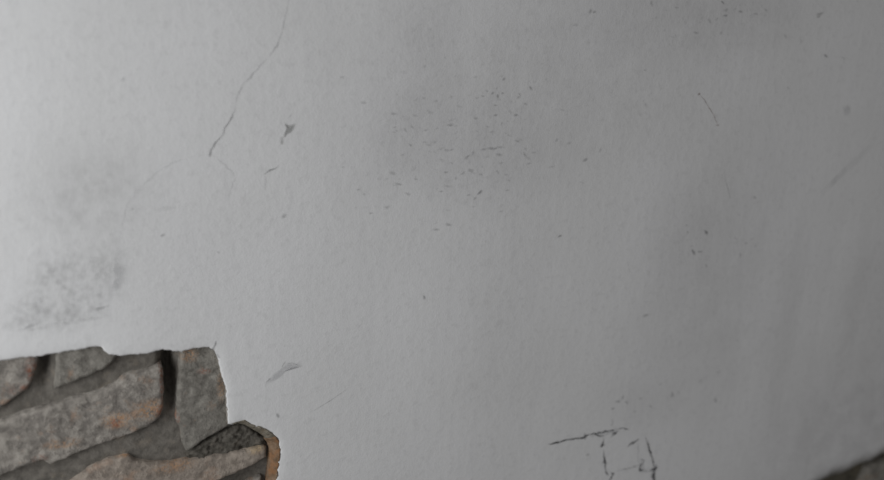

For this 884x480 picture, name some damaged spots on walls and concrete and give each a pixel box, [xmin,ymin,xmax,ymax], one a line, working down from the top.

flaking render [0,343,281,480]
crack [552,428,657,480]